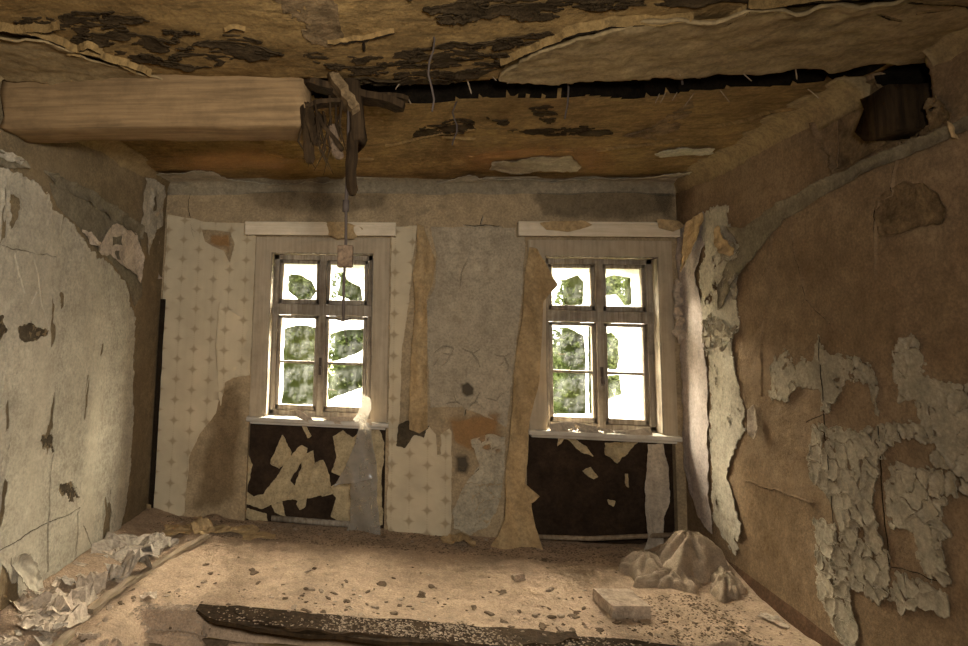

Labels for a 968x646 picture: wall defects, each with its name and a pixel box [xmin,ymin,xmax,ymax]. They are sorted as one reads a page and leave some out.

flaking render [0,11,285,85]
flaking render [275,0,968,87]
flaking render [486,105,613,137]
flaking render [440,156,691,183]
crack [756,232,774,396]
peeling [699,95,968,556]
peeling [0,149,145,646]
peeling [246,426,386,538]
peeling [557,438,598,479]
peeling [605,442,638,463]
crack [807,339,834,523]
peeling [768,333,968,646]